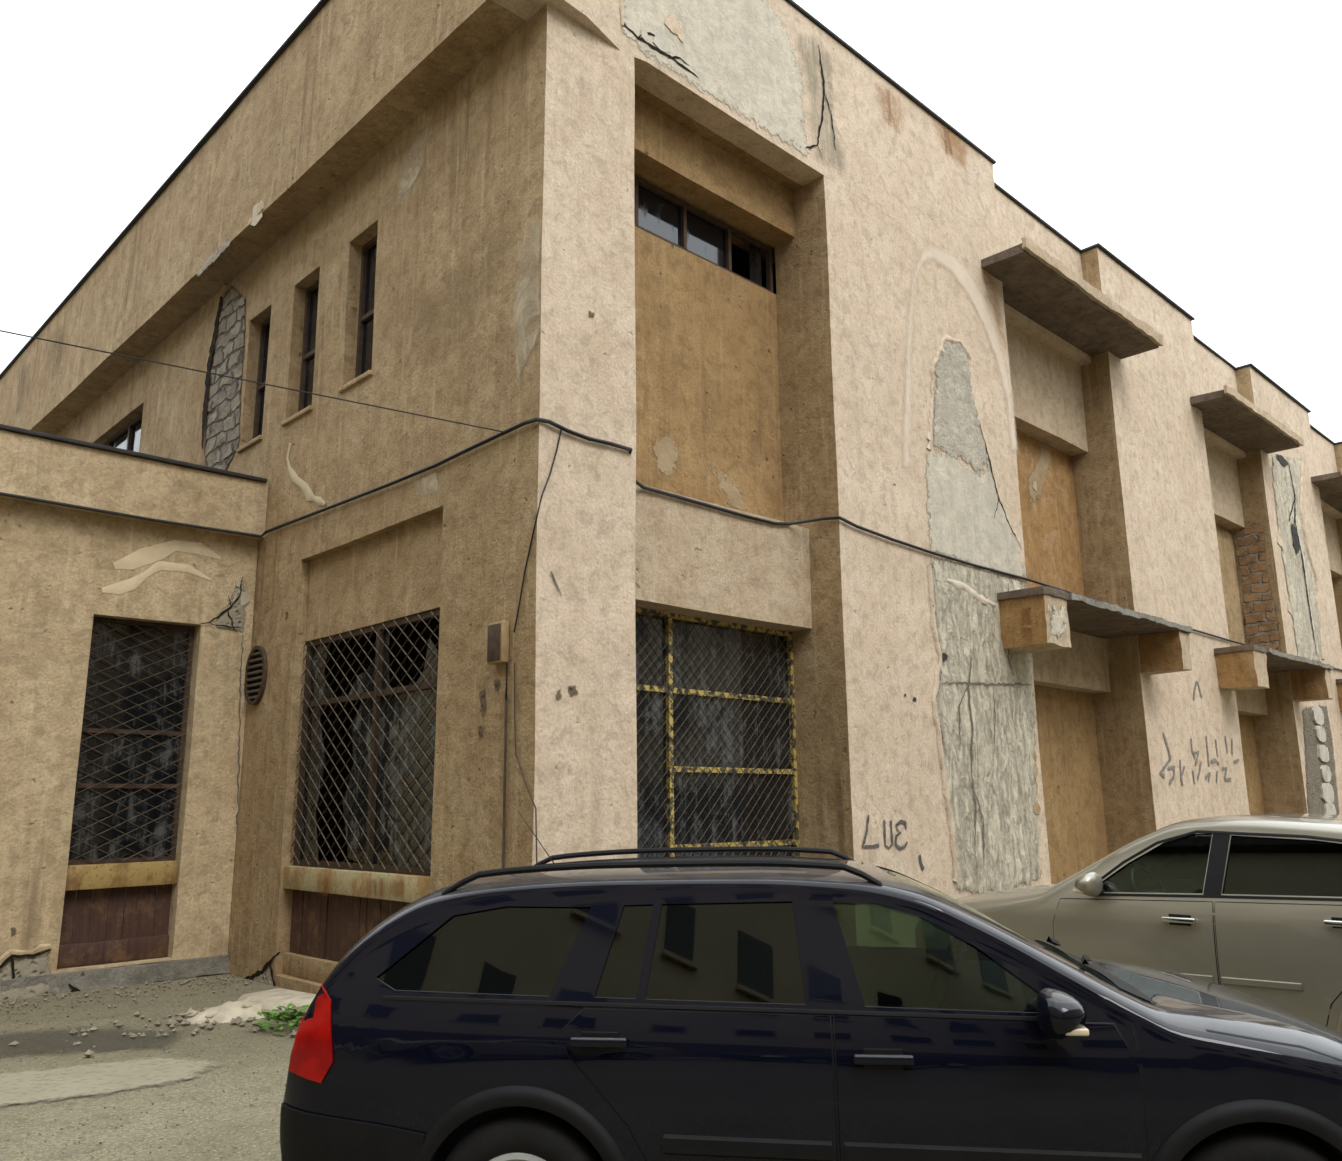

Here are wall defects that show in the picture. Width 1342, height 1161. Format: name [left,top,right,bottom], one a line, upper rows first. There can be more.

crack [624,24,698,77]
peeling [619,0,809,157]
crack [806,45,836,156]
flaking render [199,284,245,470]
spalling [1235,454,1325,661]
crack [1289,465,1317,654]
crack [201,577,244,828]
crack [940,637,1031,858]
flaking render [1302,705,1340,815]
crack [0,949,52,979]